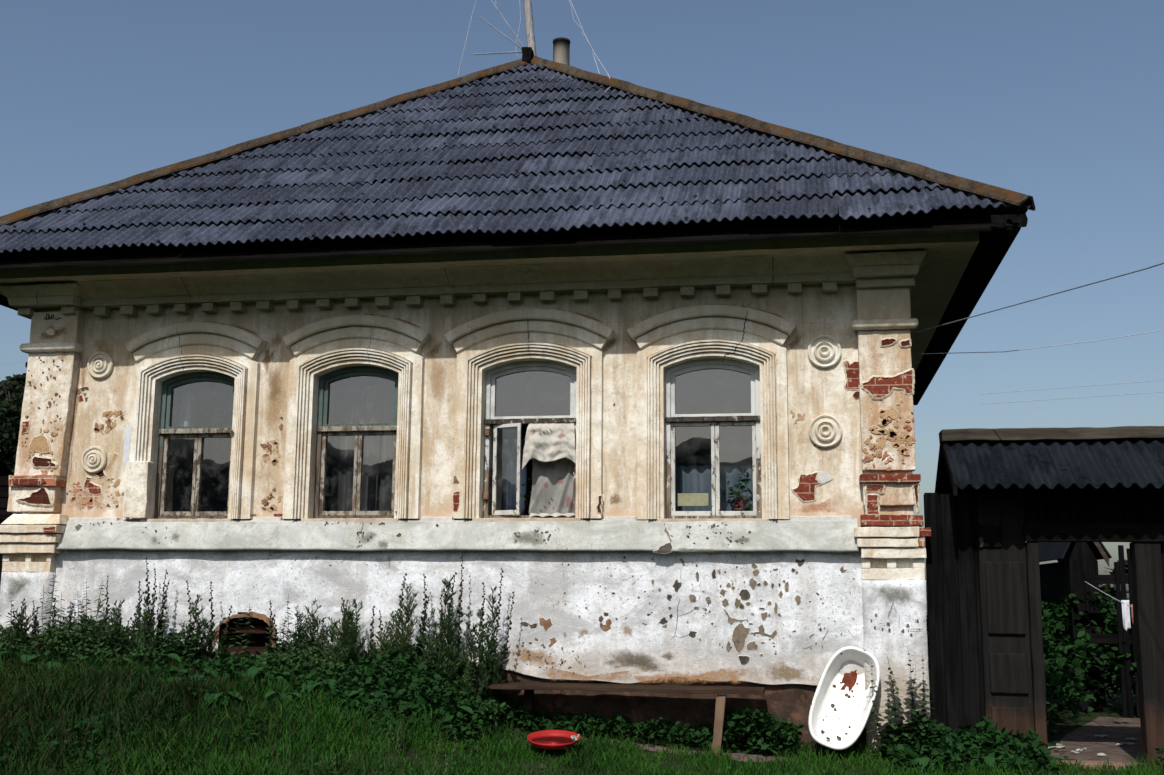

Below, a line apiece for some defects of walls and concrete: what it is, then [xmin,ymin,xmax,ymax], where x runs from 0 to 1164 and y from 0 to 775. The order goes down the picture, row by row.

spalling [879,337,912,348]
peeling [76,386,89,402]
peeling [9,355,64,507]
spalling [843,360,916,515]
spalling [66,410,132,531]
spalling [791,470,832,503]
spalling [912,483,920,514]
peeling [626,525,854,666]
peeling [513,638,586,674]